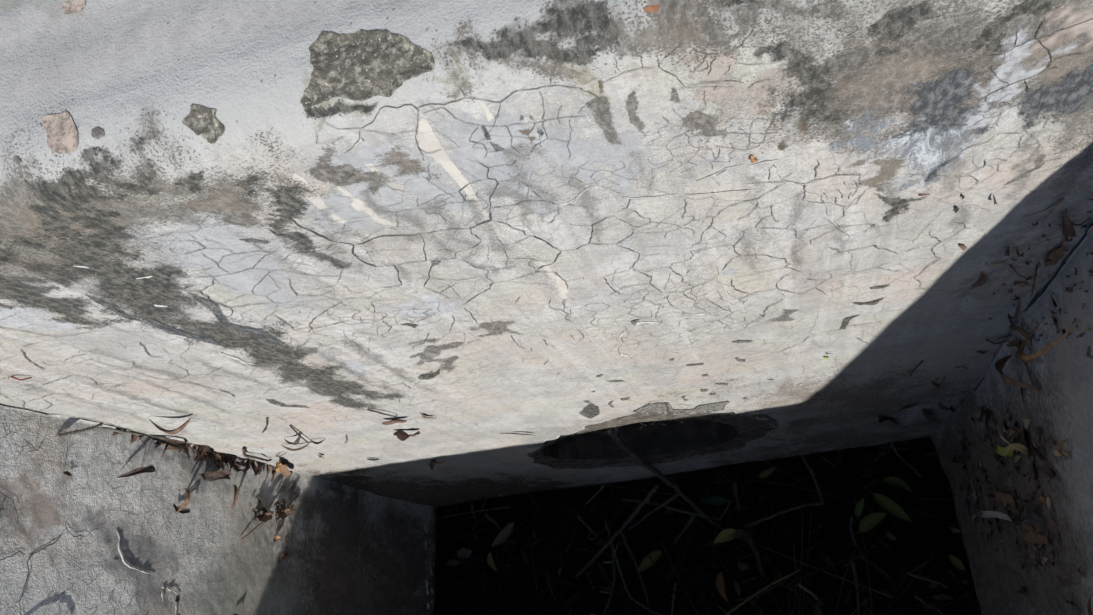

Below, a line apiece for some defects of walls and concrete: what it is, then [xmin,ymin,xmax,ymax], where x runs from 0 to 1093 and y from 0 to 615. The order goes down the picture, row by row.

spalling [300,29,435,110]
spalling [182,104,224,144]
leakage [0,0,1093,410]
crack [0,46,1093,530]
crack [0,523,105,615]